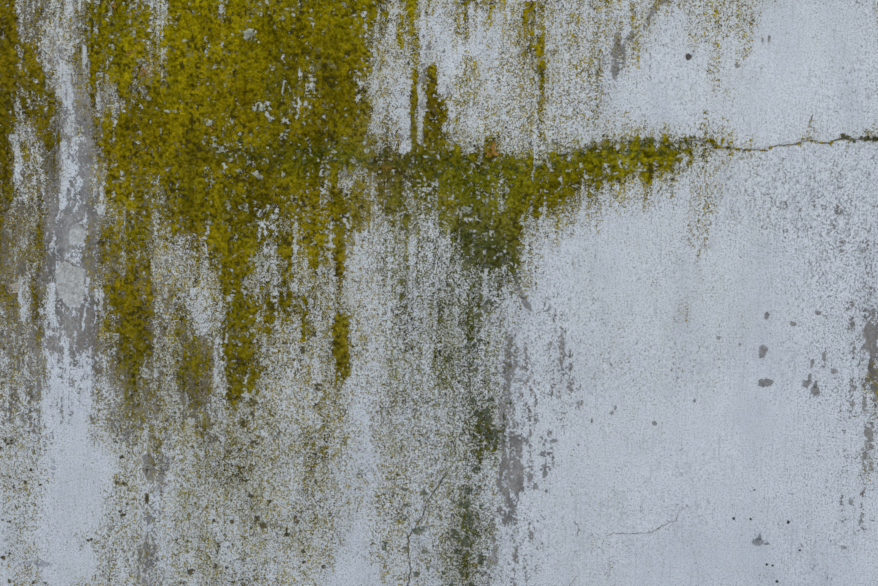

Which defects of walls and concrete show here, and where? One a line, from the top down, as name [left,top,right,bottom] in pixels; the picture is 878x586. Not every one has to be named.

leakage [435,0,762,172]
crack [617,137,872,150]
leakage [71,118,760,586]
leakage [0,309,56,586]
crack [605,506,691,536]